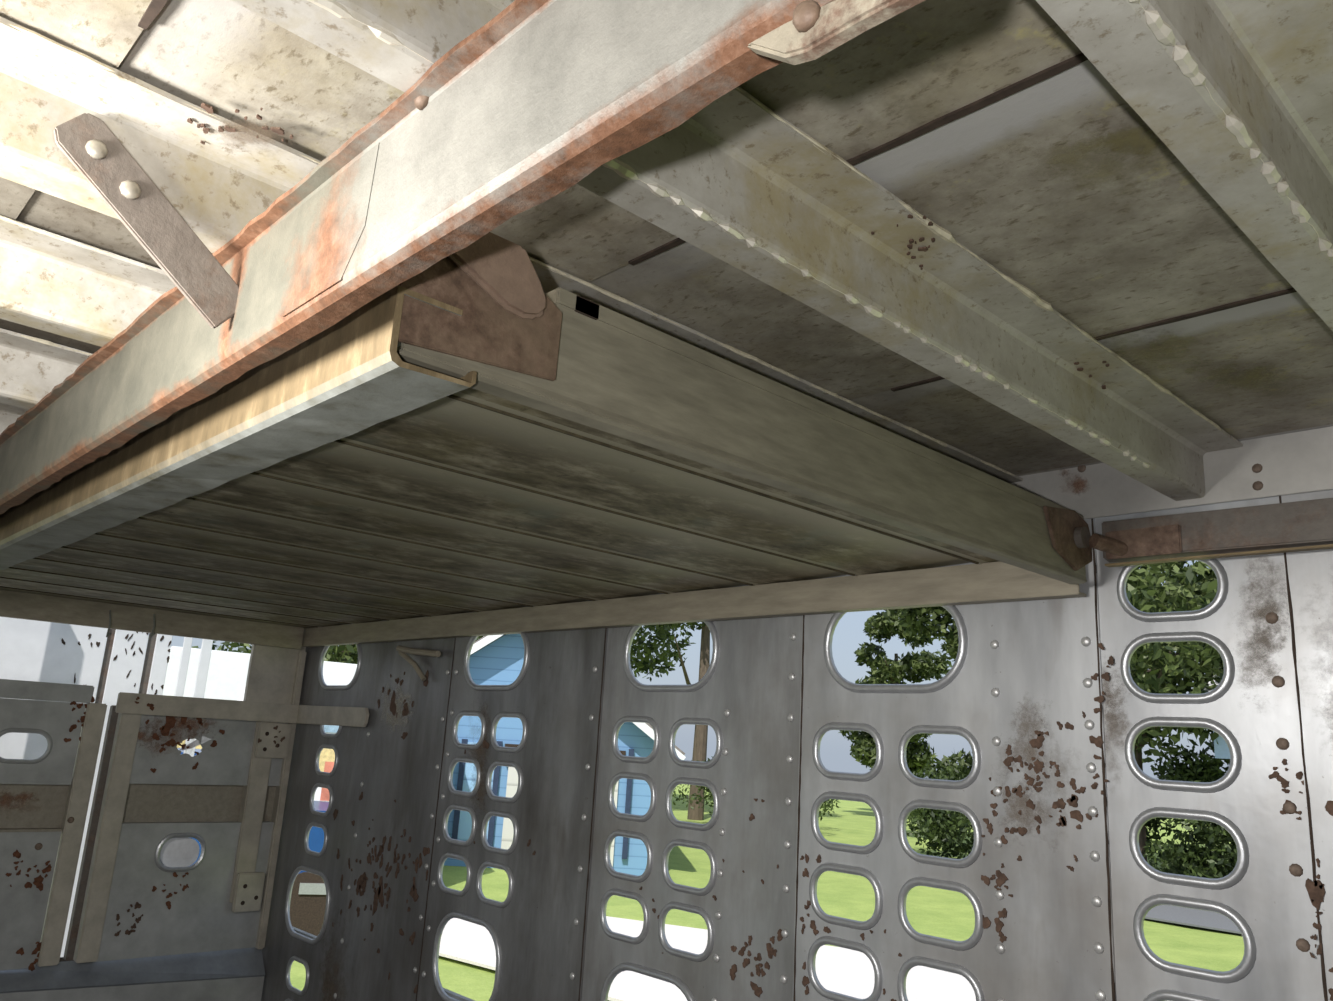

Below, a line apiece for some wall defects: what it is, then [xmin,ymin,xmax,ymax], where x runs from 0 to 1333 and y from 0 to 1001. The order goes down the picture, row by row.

corrosion [134,697,225,770]